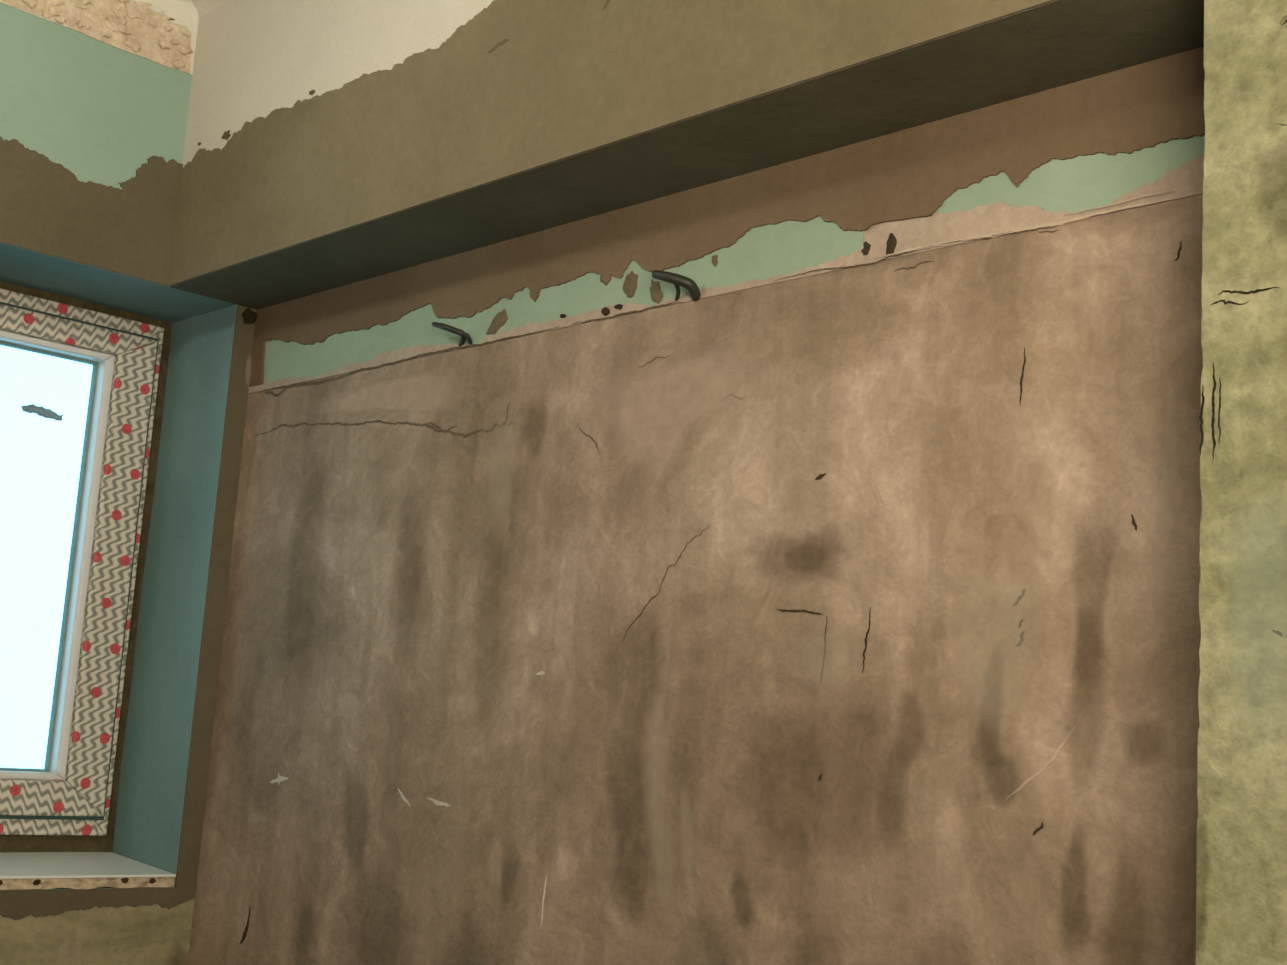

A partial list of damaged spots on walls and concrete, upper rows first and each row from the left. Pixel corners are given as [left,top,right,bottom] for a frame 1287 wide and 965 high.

spalling [0,0,193,74]
peeling [936,135,1205,214]
peeling [264,216,864,383]
crack [773,226,1057,282]
crack [254,301,683,438]
crack [1199,363,1222,459]
crack [622,525,710,642]